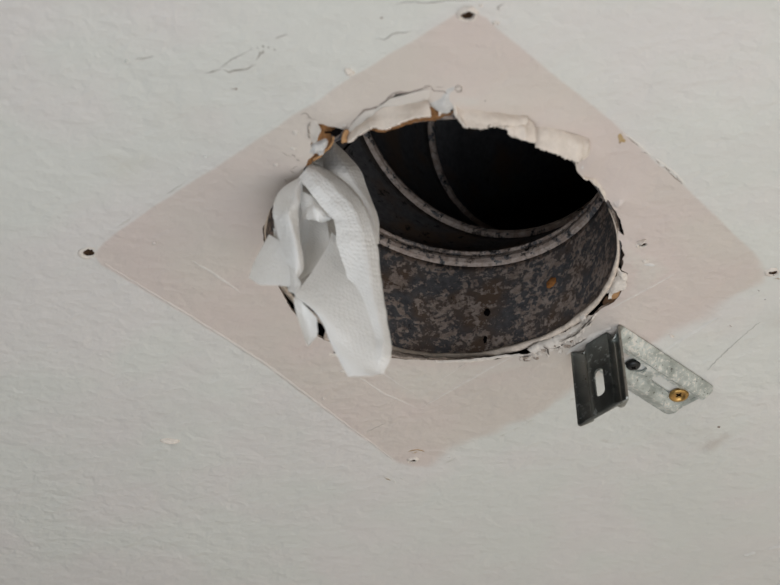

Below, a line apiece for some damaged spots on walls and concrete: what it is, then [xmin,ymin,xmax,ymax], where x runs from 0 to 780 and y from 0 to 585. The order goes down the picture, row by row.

crack [205,34,288,73]
peeling [341,89,625,208]
spalling [603,267,628,306]
spalling [435,313,598,363]